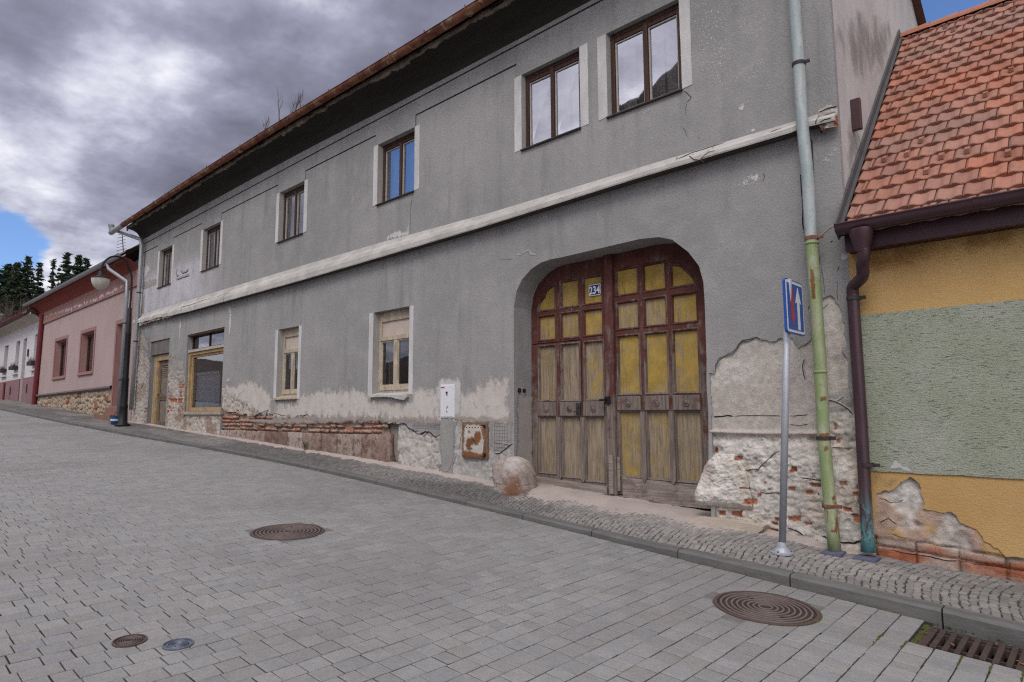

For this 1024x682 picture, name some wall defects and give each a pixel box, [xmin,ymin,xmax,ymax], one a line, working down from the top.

crack [676,90,725,164]
peeling [167,355,533,481]
crack [390,422,462,440]
spalling [709,295,861,550]
spalling [874,461,1024,583]